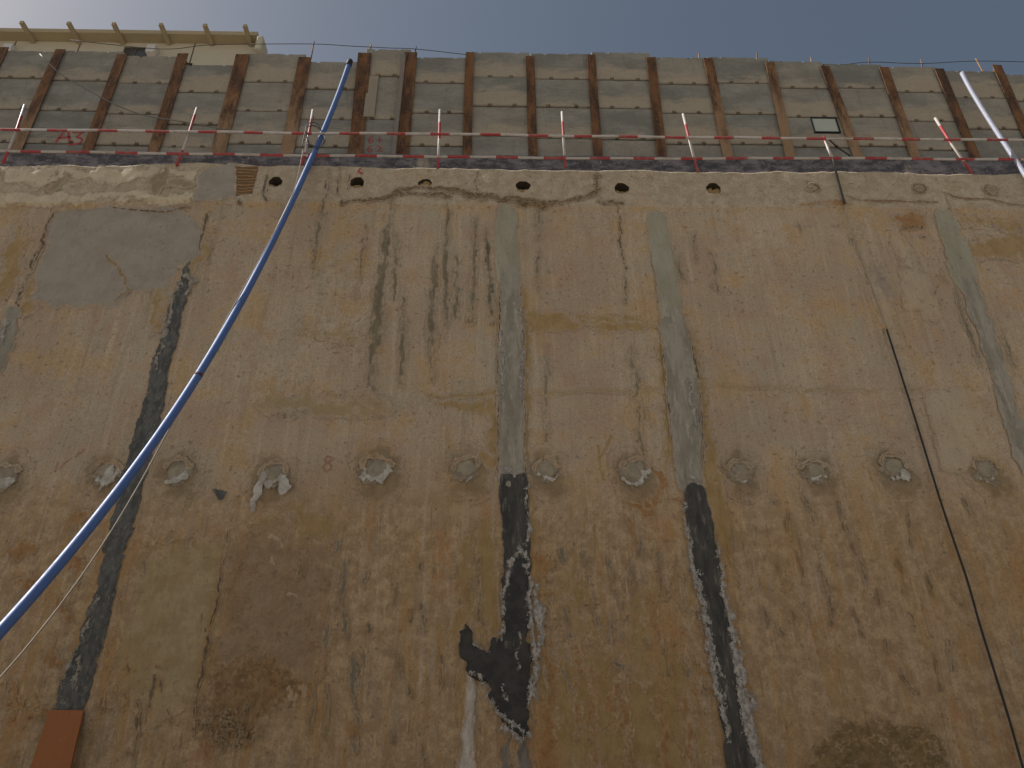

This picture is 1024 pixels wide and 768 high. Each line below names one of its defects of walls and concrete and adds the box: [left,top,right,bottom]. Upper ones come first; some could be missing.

leakage [349,197,411,393]
leakage [423,199,496,384]
efflorescence [455,669,478,768]